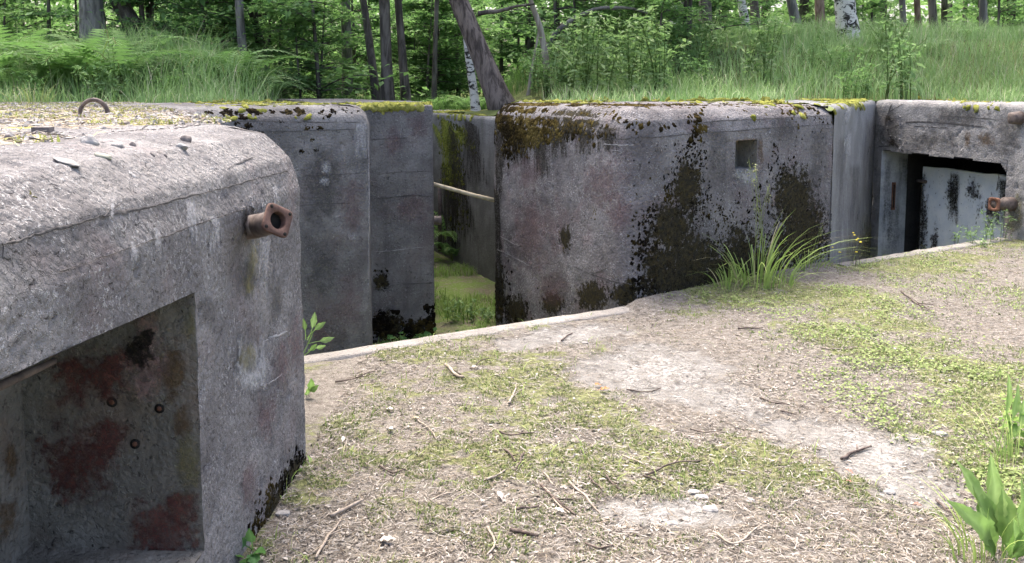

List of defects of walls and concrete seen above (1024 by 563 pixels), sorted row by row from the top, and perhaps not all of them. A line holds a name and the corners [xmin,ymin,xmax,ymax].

rust [130,493,200,551]